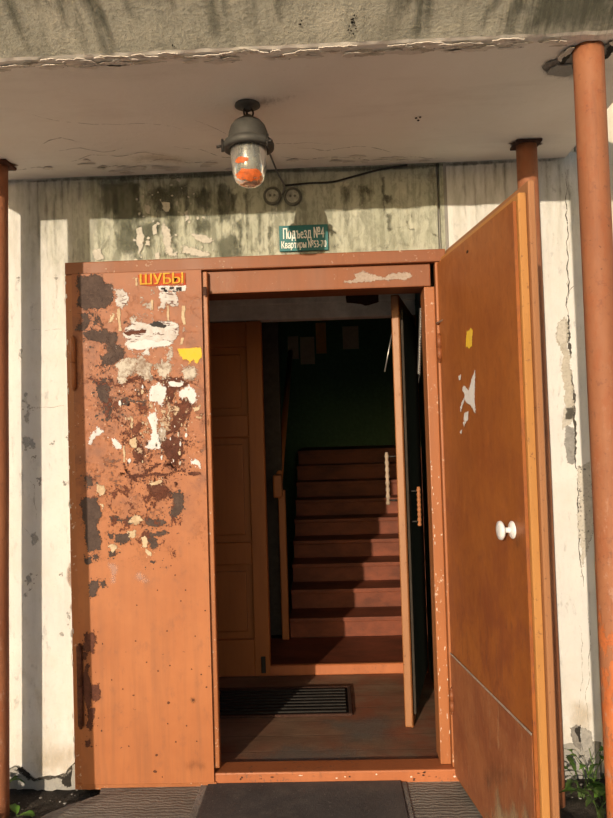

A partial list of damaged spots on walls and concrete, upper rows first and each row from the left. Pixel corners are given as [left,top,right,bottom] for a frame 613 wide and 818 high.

peeling [0,37,579,77]
spalling [604,40,613,59]
peeling [47,137,232,260]
leakage [73,171,247,257]
leakage [266,161,492,230]
flaking render [346,295,379,306]
peeling [344,271,412,284]
peeling [55,272,208,570]
crack [556,173,594,587]
peeling [575,462,594,577]
peeling [59,610,103,747]
flaking render [12,753,76,791]